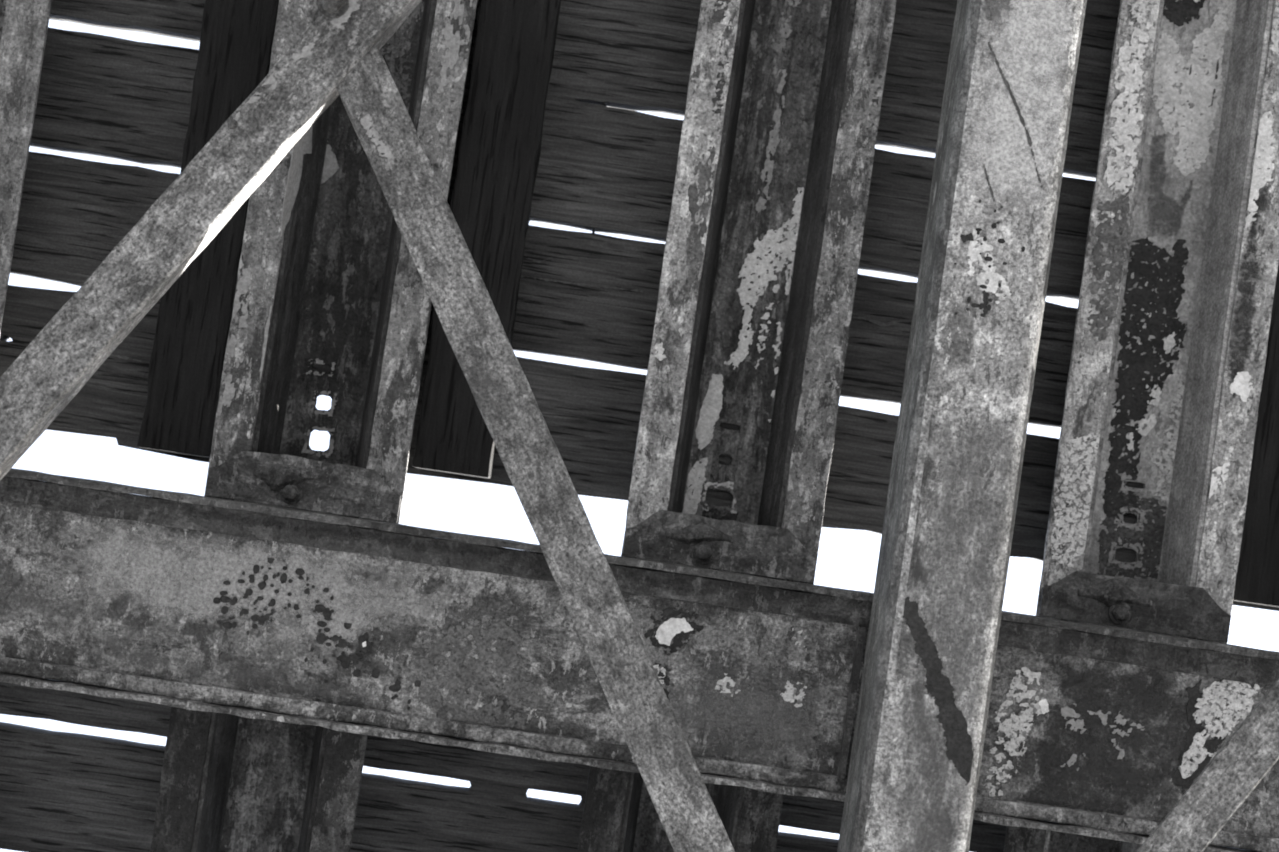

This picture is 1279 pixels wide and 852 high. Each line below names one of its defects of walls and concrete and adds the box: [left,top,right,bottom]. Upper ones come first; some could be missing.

peeling [1103,0,1229,194]
peeling [683,69,804,514]
peeling [1162,332,1176,354]
rust [921,455,932,490]
peeling [1126,379,1185,504]
rust [909,505,927,584]
peeling [655,617,693,646]
rust [896,597,974,852]
peeling [984,666,1144,797]
rust [1020,662,1226,815]
peeling [1178,679,1260,779]